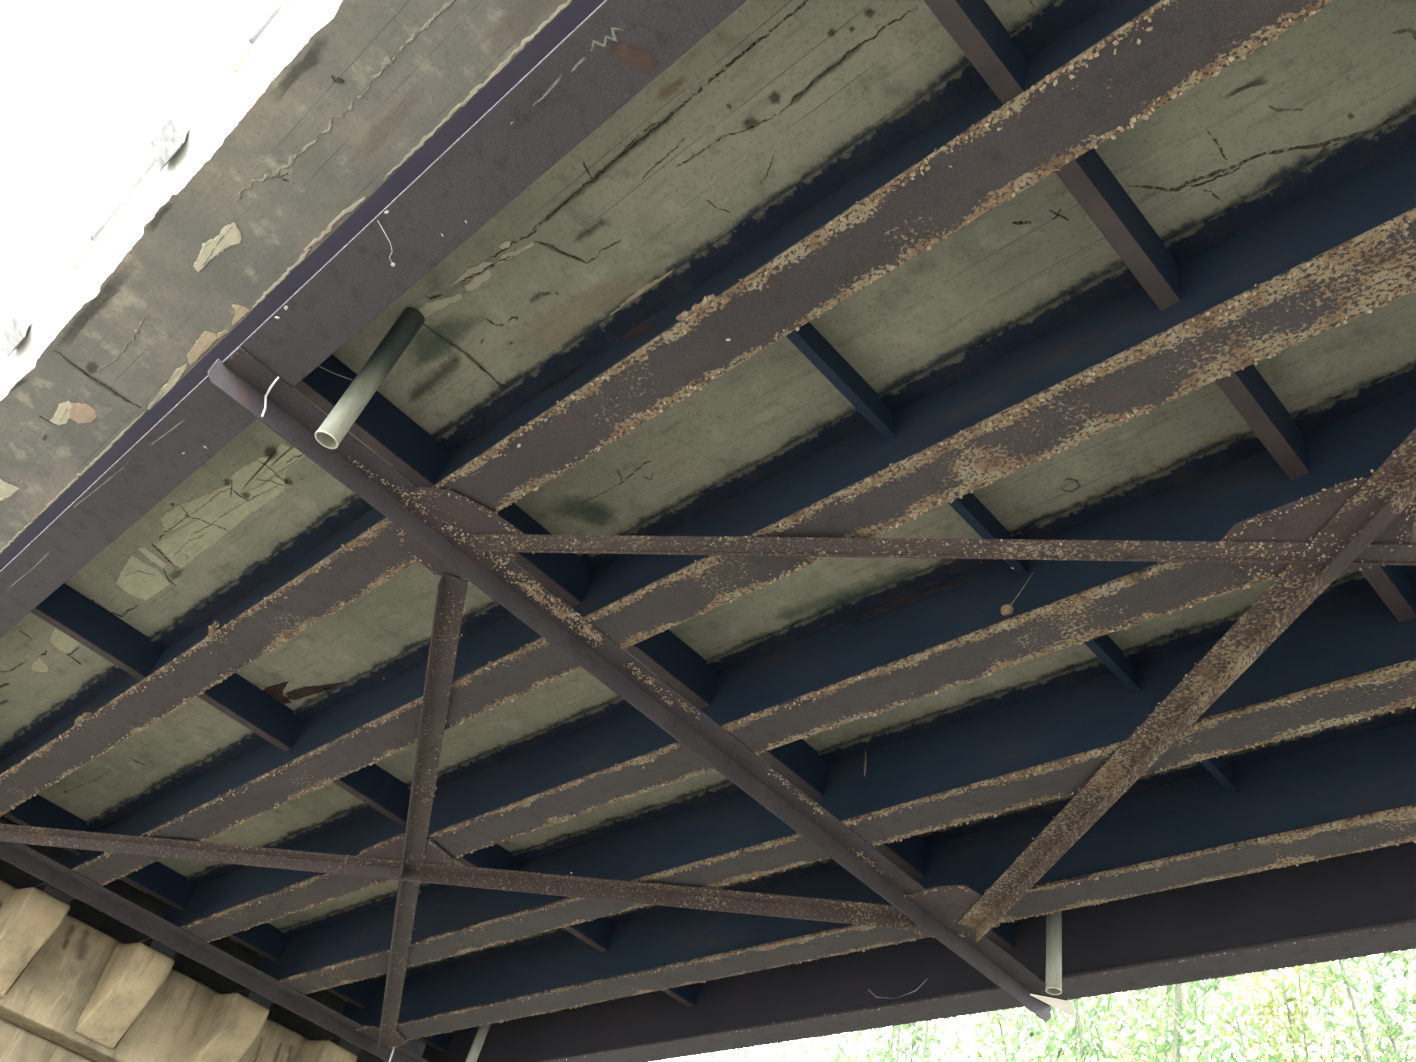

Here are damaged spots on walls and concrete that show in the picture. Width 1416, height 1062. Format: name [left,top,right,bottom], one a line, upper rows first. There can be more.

spalling [384,0,572,180]
crack [527,0,913,264]
crack [1012,209,1069,225]
crack [1131,104,1416,202]
crack [1393,28,1416,40]
spalling [0,197,365,553]
peeling [91,443,305,617]
corrosion [263,681,344,704]